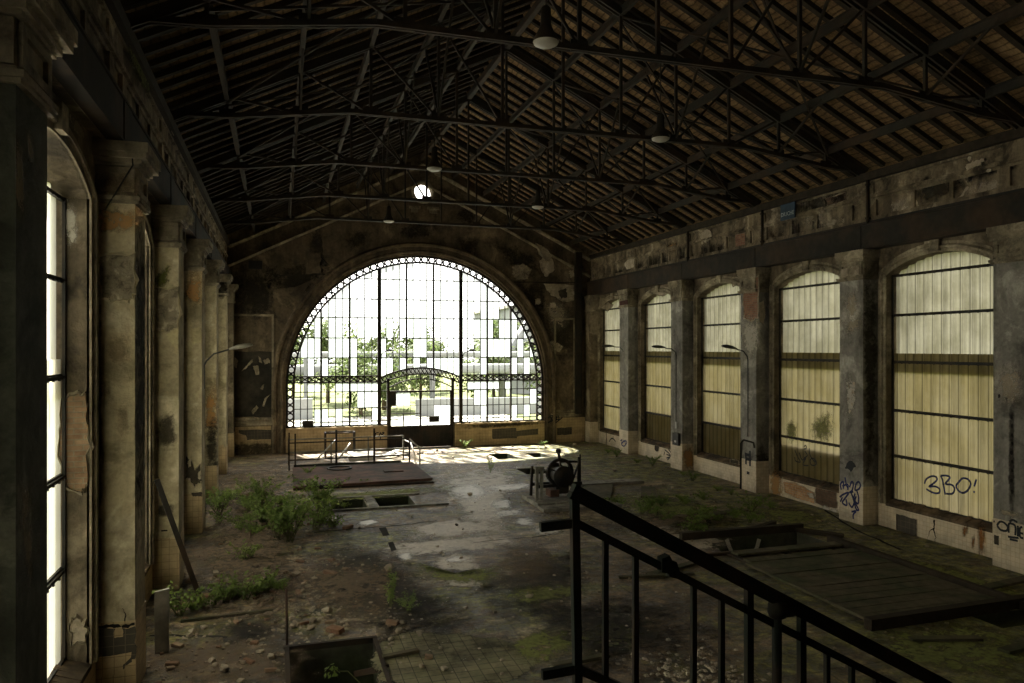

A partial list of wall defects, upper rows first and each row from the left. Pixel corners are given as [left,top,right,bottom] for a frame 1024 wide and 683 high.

flaking render [732,275,766,324]
flaking render [57,390,95,496]
leakage [157,415,175,446]
peeling [184,455,203,497]
corrosion [963,525,985,555]
peeling [67,613,137,669]